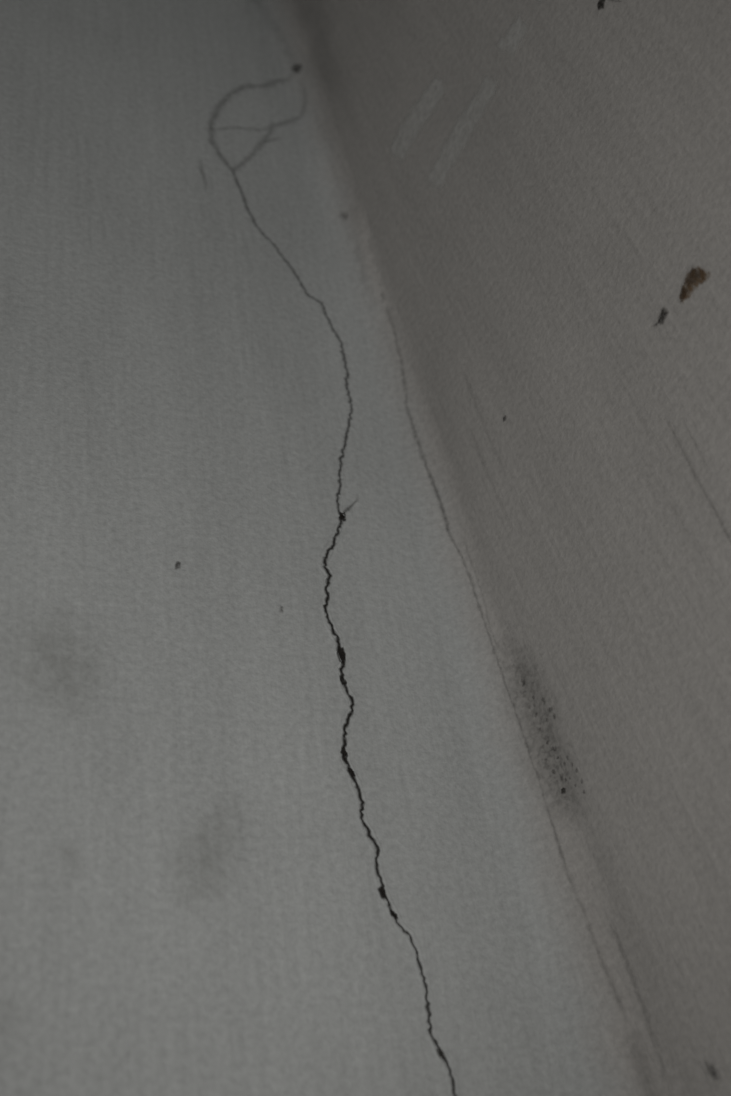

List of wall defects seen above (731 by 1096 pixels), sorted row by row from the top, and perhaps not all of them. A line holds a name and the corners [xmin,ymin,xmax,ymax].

crack [318,320,461,1096]